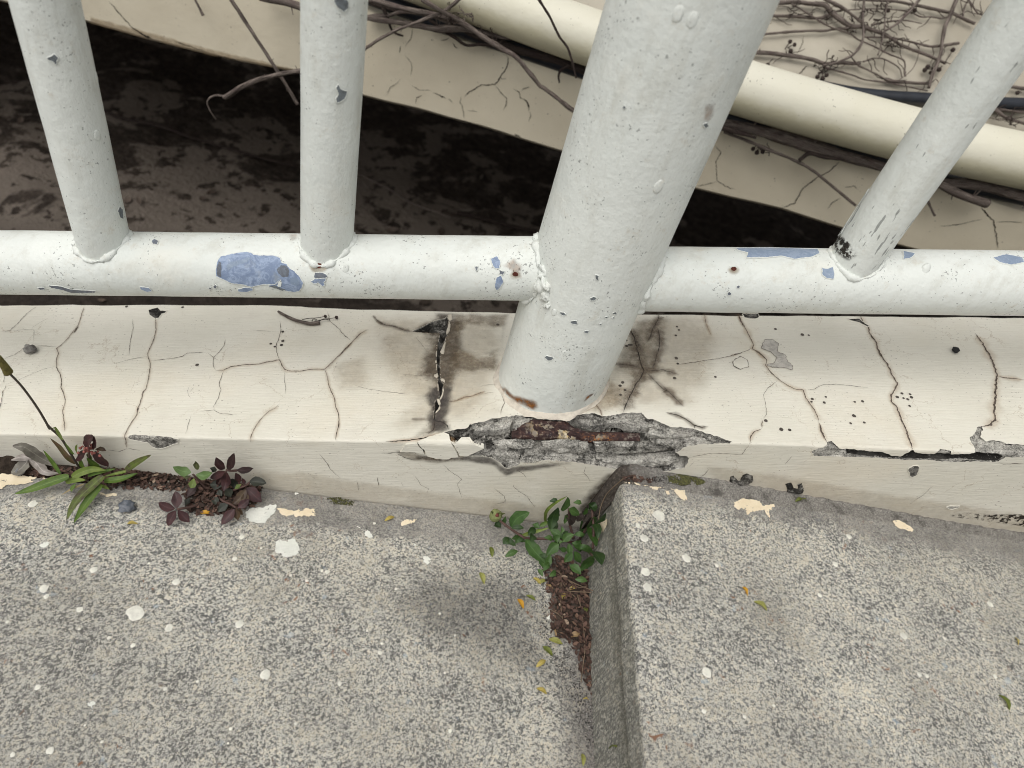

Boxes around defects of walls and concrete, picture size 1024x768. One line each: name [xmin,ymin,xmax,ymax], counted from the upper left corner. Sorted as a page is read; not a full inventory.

peeling [209,251,328,292]
peeling [735,247,835,280]
peeling [993,254,1024,265]
crack [0,307,83,430]
crack [112,315,505,497]
corrosion [503,389,536,409]
crack [596,315,913,477]
peeling [761,339,793,370]
crack [977,336,1023,427]
peeling [128,434,179,449]
spalling [449,415,725,467]
spalling [812,428,1024,478]